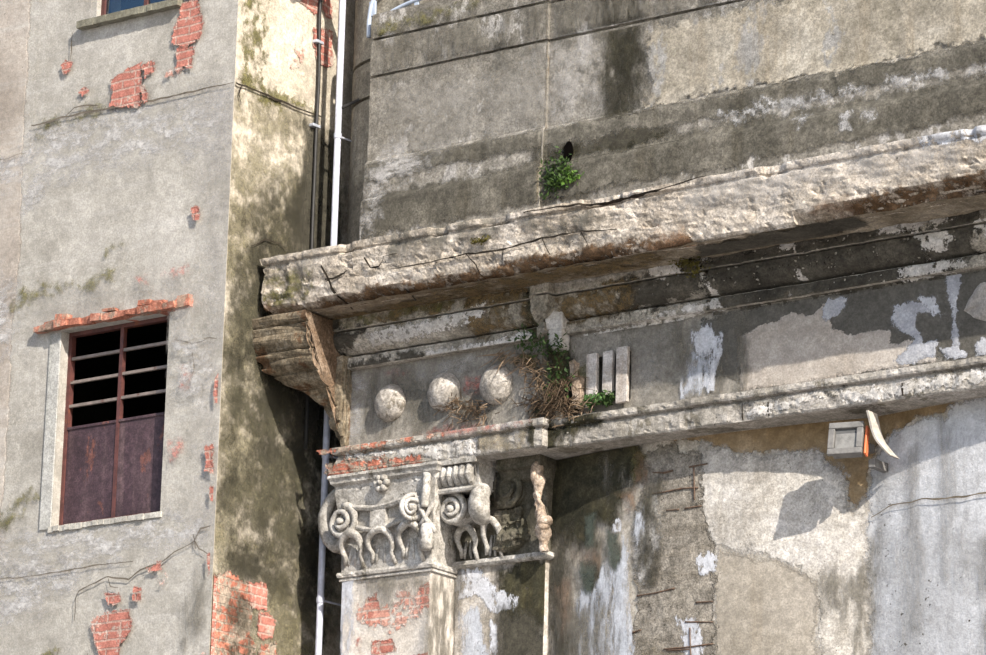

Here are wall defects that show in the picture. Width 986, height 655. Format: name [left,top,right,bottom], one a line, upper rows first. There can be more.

leakage [213,0,586,655]
crack [321,176,705,310]
leakage [331,210,986,399]
leakage [361,0,986,258]
peeling [740,296,986,391]
rust [815,169,986,220]
crack [1,525,211,621]
flaking render [201,553,277,655]
flaking render [356,582,430,655]
leakage [367,445,662,655]
peeling [631,397,986,655]
crack [871,492,986,518]